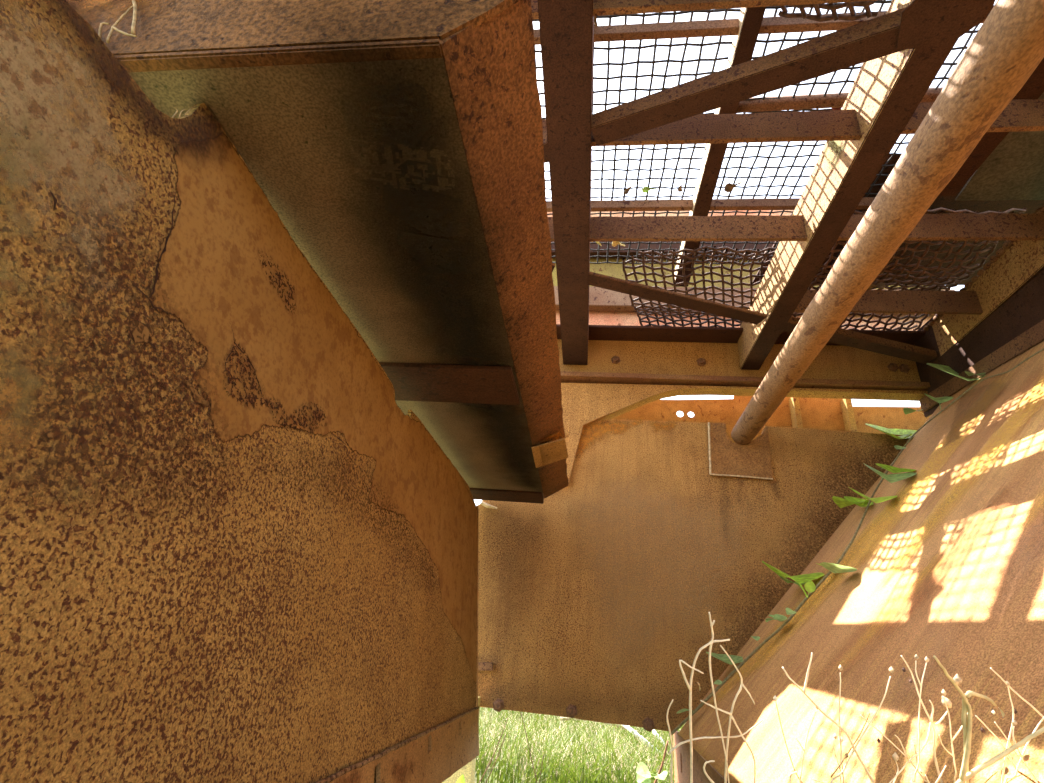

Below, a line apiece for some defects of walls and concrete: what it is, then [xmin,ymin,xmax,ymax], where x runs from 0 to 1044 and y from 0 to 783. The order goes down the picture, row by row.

rust [39,0,477,684]
rust [576,421,674,457]